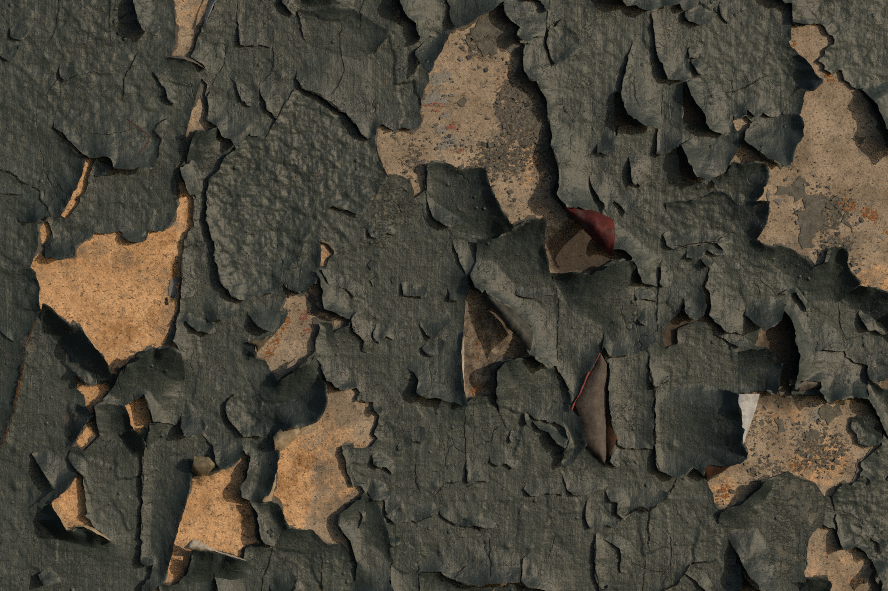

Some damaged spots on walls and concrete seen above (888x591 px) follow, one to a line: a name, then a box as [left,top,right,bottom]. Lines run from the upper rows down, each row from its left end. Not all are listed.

peeling [0,0,580,591]
crack [593,538,604,591]
peeling [374,0,888,591]